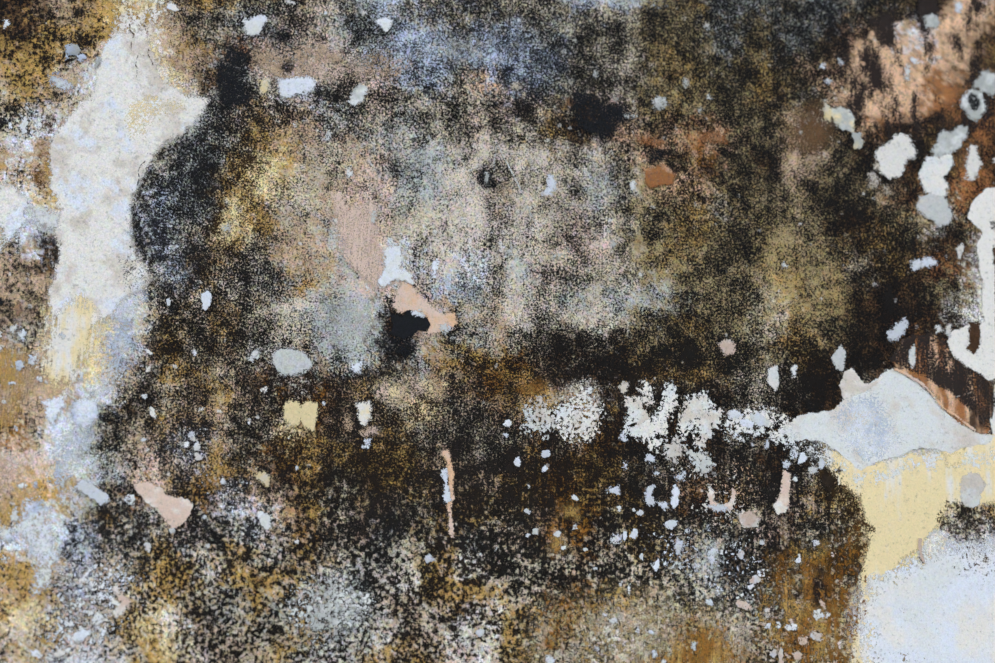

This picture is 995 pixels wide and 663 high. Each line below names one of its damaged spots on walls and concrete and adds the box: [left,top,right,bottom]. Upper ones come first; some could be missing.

peeling [651,96,667,111]
spalling [819,0,995,228]
peeling [630,163,676,194]
peeling [327,190,458,340]
damp [400,228,445,307]
damp [0,233,60,429]
peeling [605,188,995,545]
damp [41,396,66,429]
damp [937,499,995,576]